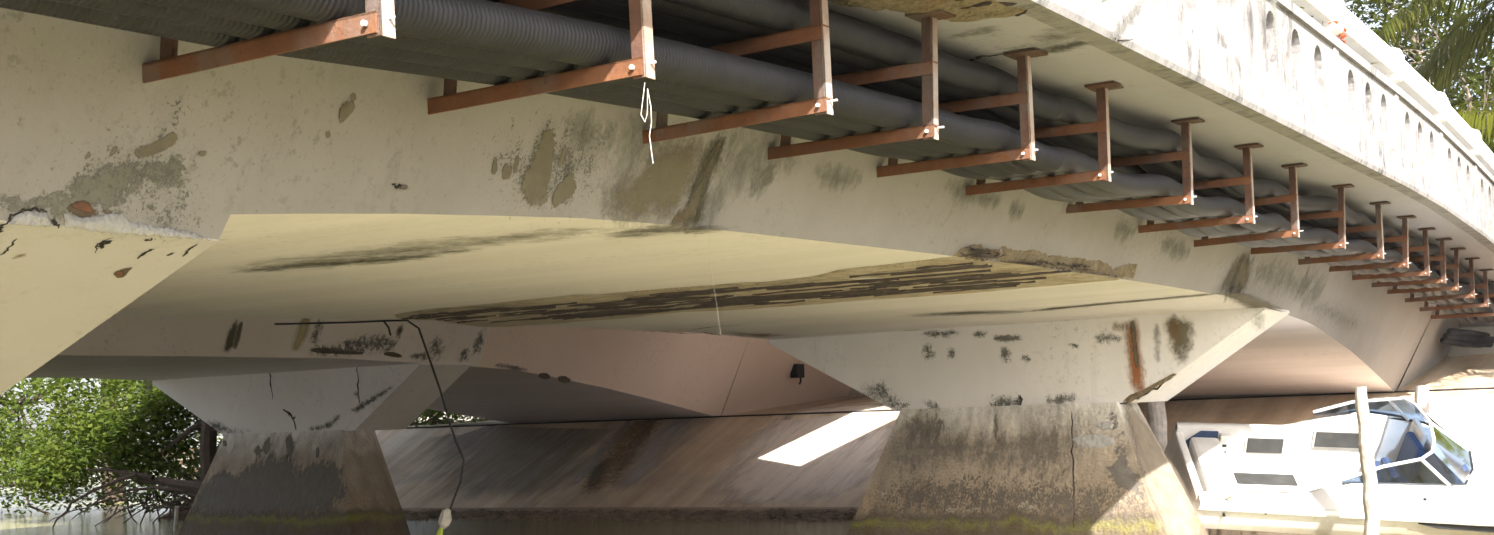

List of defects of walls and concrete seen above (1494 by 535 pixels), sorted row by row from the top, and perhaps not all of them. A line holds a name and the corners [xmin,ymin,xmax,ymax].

spalling [830,0,1027,22]
peeling [0,95,212,255]
leakage [604,138,770,237]
crack [0,224,23,257]
crack [95,237,197,259]
leakage [253,236,534,271]
spalling [395,244,1138,327]
leakage [224,321,243,351]
leakage [342,335,397,352]
leakage [923,311,1031,362]
rust [1114,316,1193,391]
leakage [1047,395,1076,404]